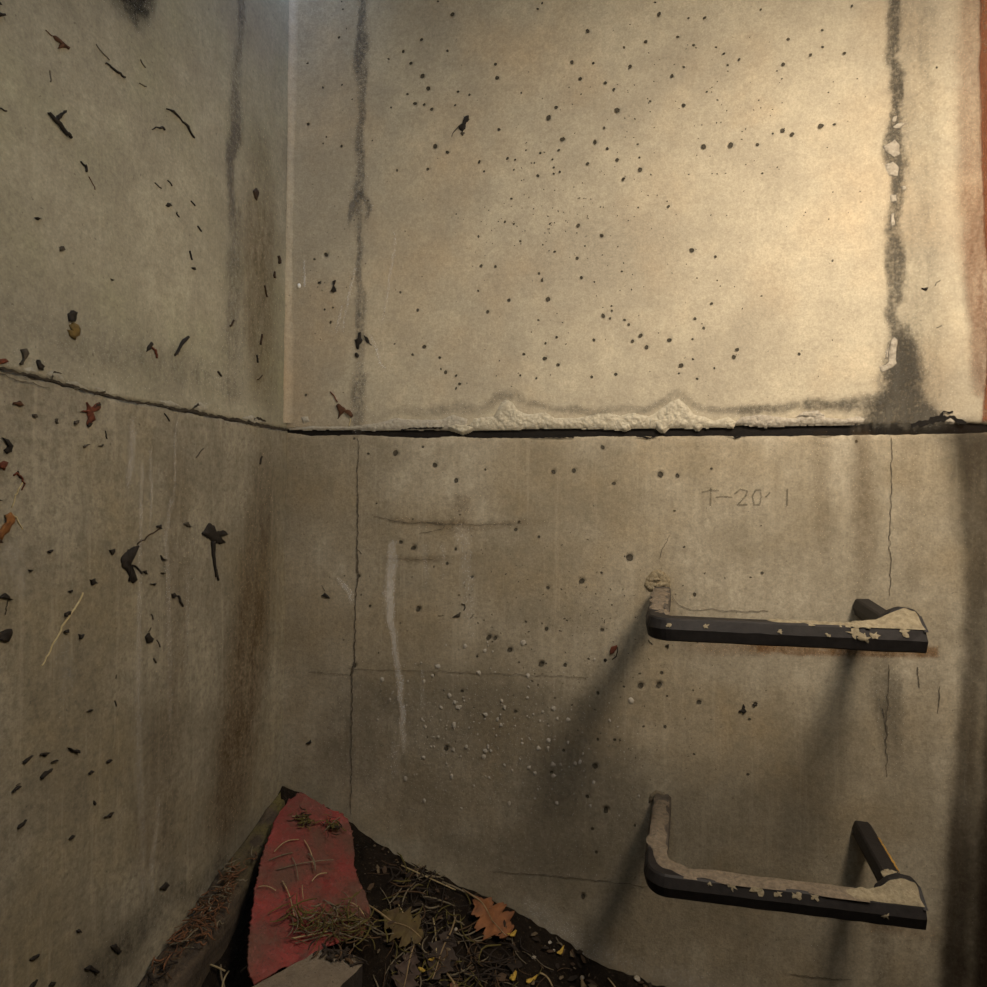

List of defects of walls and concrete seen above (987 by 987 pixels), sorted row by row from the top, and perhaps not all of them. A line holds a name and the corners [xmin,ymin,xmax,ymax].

water stain [348,108,371,341]
water stain [355,0,367,85]
water stain [804,0,945,429]
rust [967,0,987,339]
crack [0,367,987,813]
water stain [943,740,987,987]